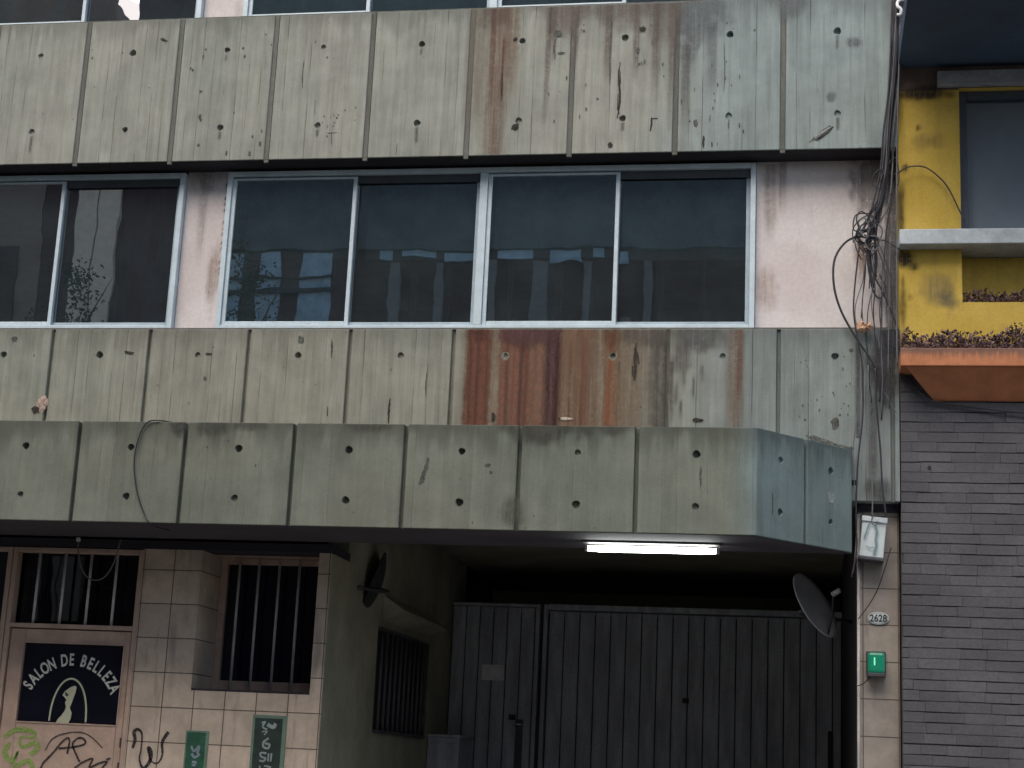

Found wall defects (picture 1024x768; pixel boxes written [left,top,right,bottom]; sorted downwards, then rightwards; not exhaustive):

spalling [31,395,48,414]
corrosion [463,329,663,427]